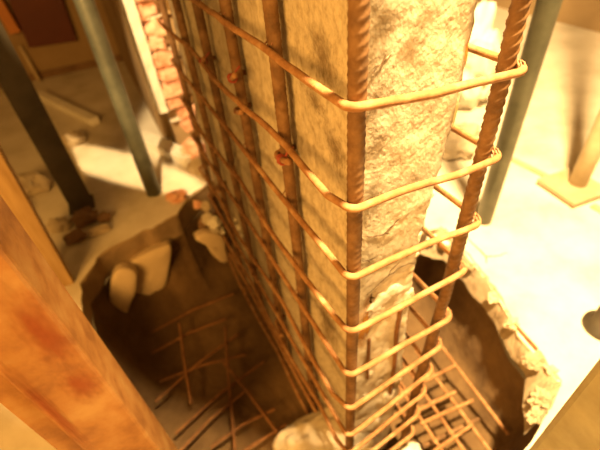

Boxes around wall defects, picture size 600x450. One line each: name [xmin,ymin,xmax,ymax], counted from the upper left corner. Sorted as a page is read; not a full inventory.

spalling [134,0,269,330]
spalling [151,293,287,450]
spalling [219,0,291,372]
spalling [262,0,317,412]
spalling [347,0,371,102]
spalling [345,79,562,450]
spalling [495,0,533,73]